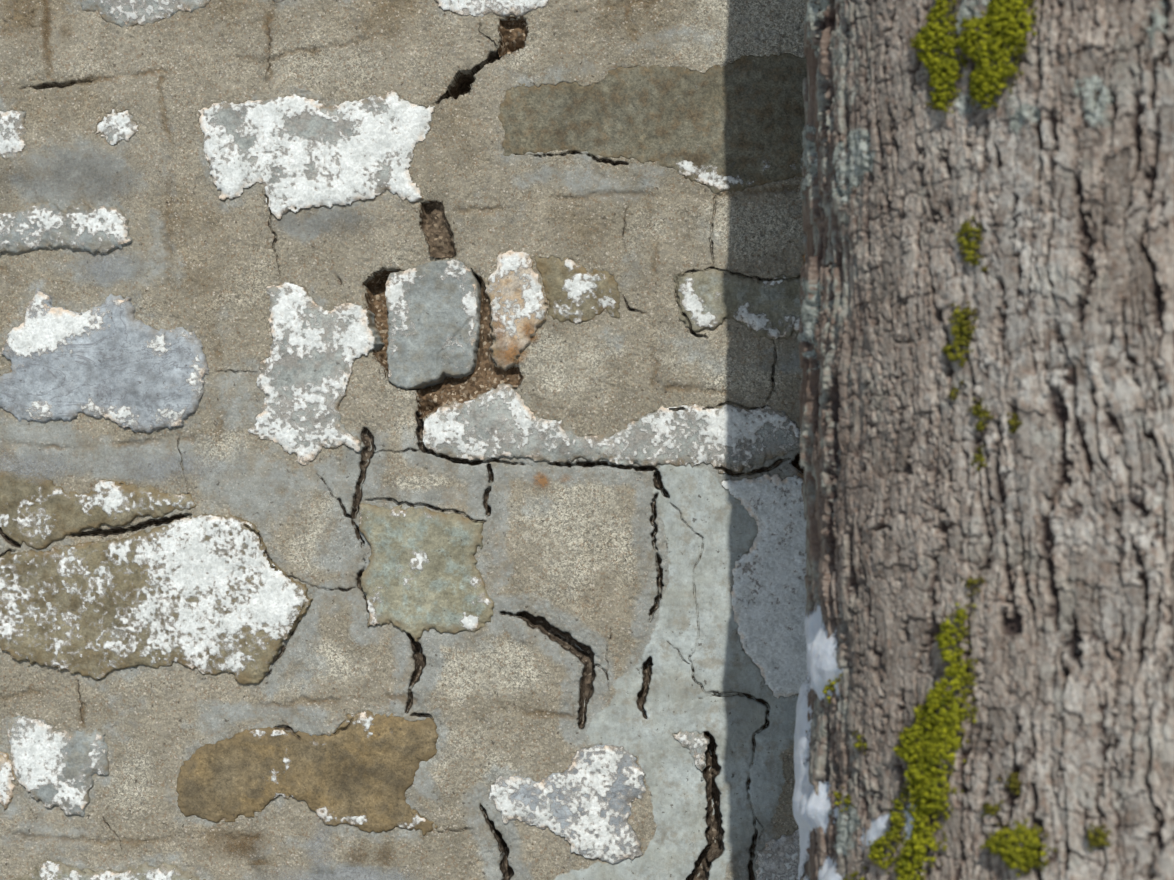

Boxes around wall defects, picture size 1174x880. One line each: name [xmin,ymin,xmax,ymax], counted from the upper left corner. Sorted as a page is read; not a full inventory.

crack [433,22,503,104]
crack [71,435,188,537]
crack [0,527,21,556]
crack [239,411,770,880]